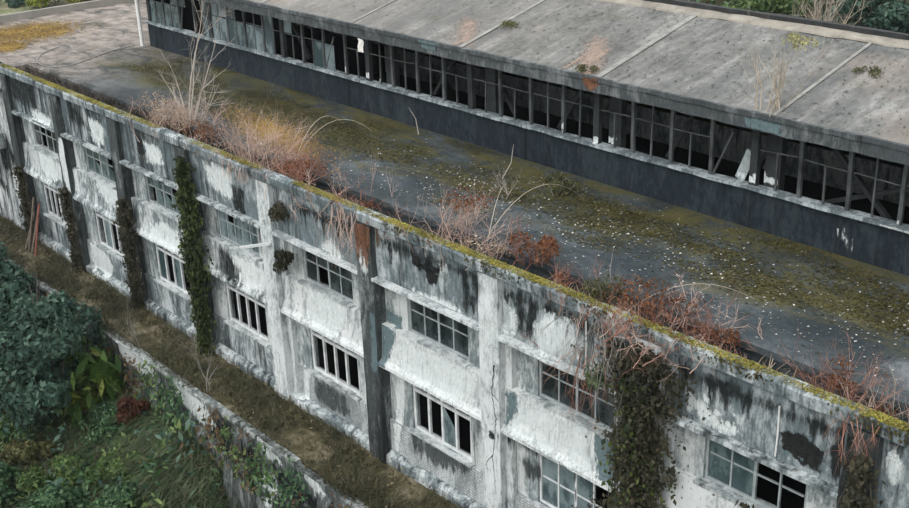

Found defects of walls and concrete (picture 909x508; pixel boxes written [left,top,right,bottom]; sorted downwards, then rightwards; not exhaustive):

corrosion [565,39,608,90]
water stain [0,135,15,199]
corrosion [354,222,378,268]
water stain [377,236,478,314]
water stain [504,288,614,339]
crack [486,365,498,491]
water stain [679,359,856,479]